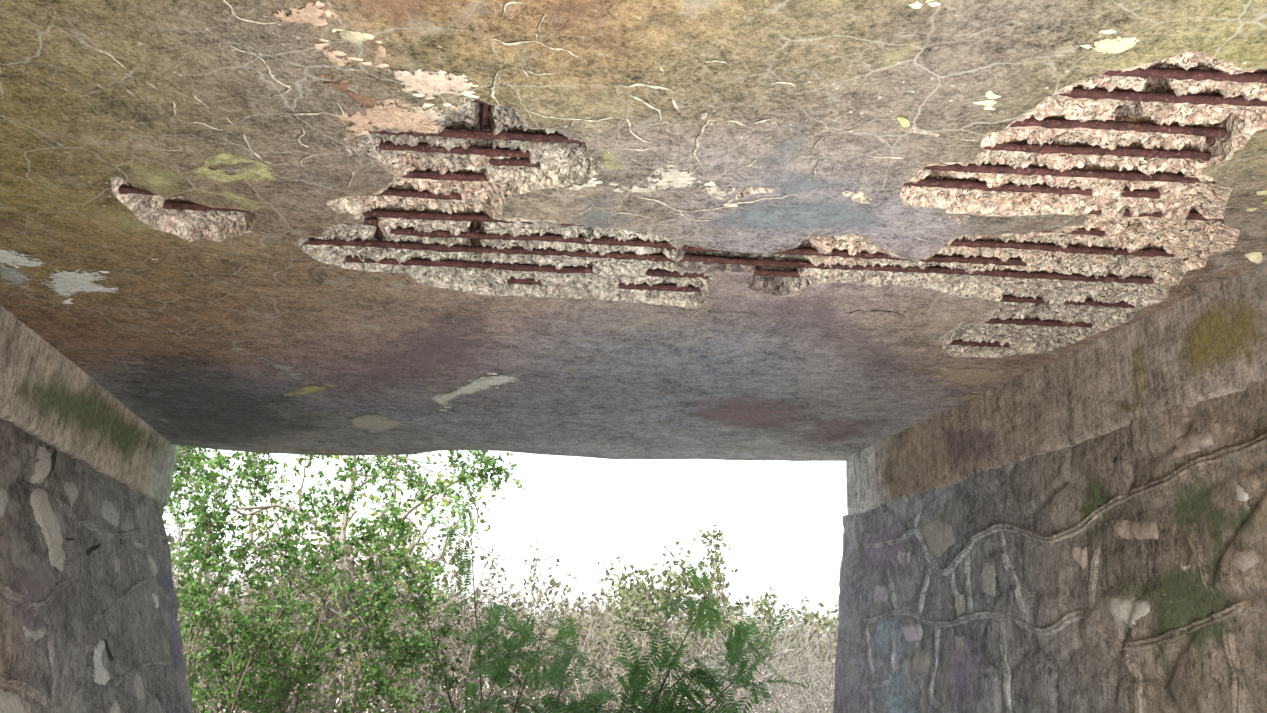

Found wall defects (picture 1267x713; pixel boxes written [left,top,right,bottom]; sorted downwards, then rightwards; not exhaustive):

spalling [110,177,257,242]
crack [97,0,345,173]
crack [482,1,774,172]
crack [562,119,903,225]
spalling [269,0,1267,400]